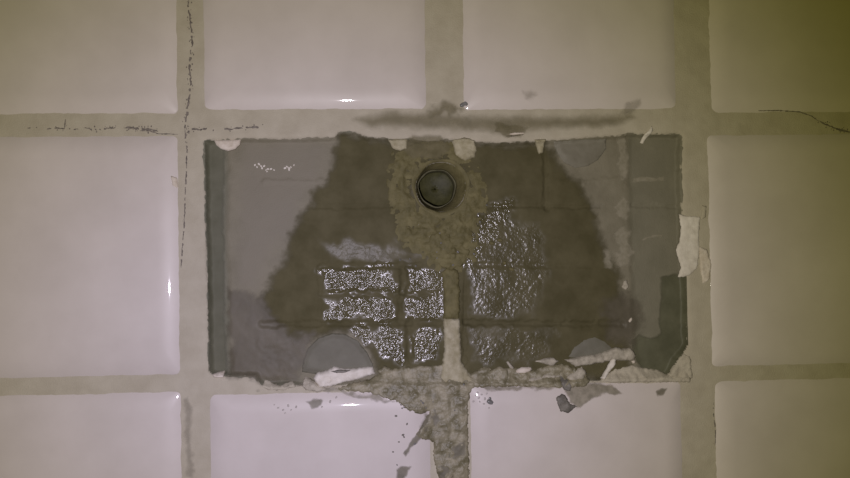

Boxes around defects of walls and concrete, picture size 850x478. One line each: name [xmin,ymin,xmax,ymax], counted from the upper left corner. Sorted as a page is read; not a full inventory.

crack [28,0,263,266]
peeling [214,139,241,151]
peeling [388,139,408,151]
peeling [452,137,477,161]
crack [759,110,850,133]
leakage [205,105,688,381]
peeling [675,205,711,284]
peeling [314,366,375,387]